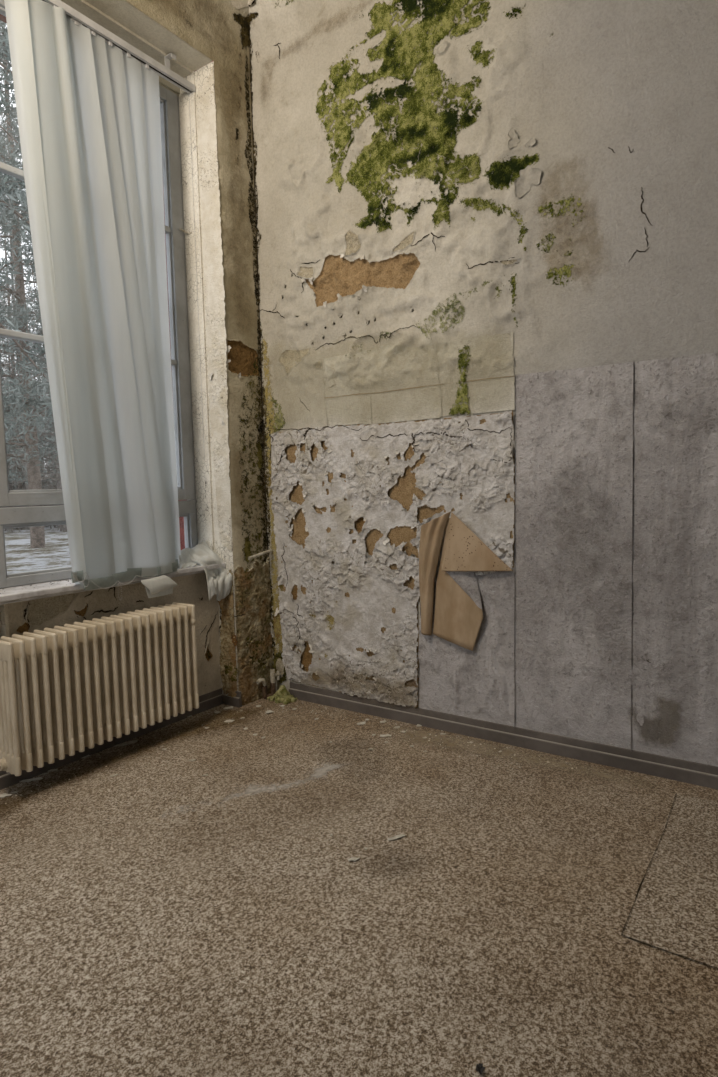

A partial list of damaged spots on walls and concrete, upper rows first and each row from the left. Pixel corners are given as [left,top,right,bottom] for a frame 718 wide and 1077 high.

peeling [195,66,260,551]
damp [236,39,283,660]
spalling [278,229,424,388]
crack [629,187,653,261]
spalling [217,410,516,707]
damp [635,700,679,743]